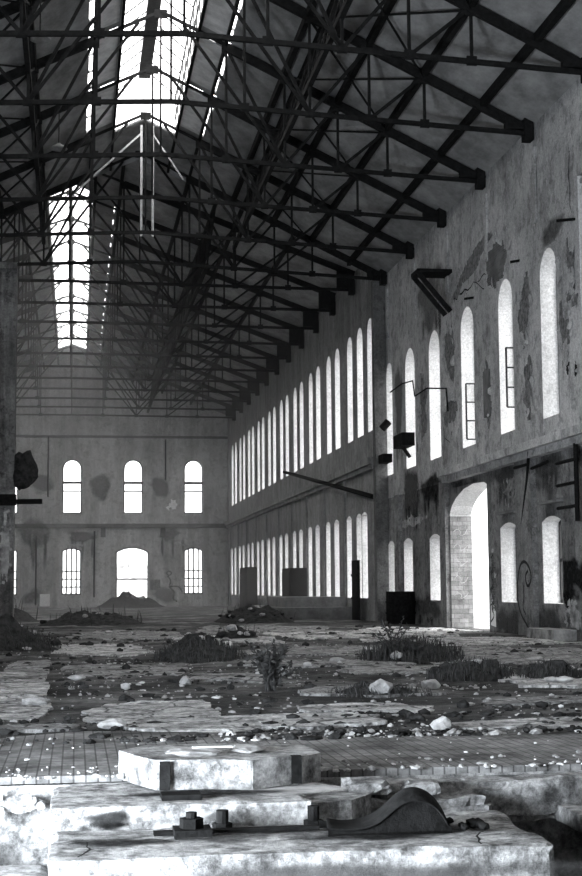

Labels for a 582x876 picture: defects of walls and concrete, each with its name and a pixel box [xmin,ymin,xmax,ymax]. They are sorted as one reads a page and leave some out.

flaking render [449,231,512,302]
leakage [90,475,110,500]